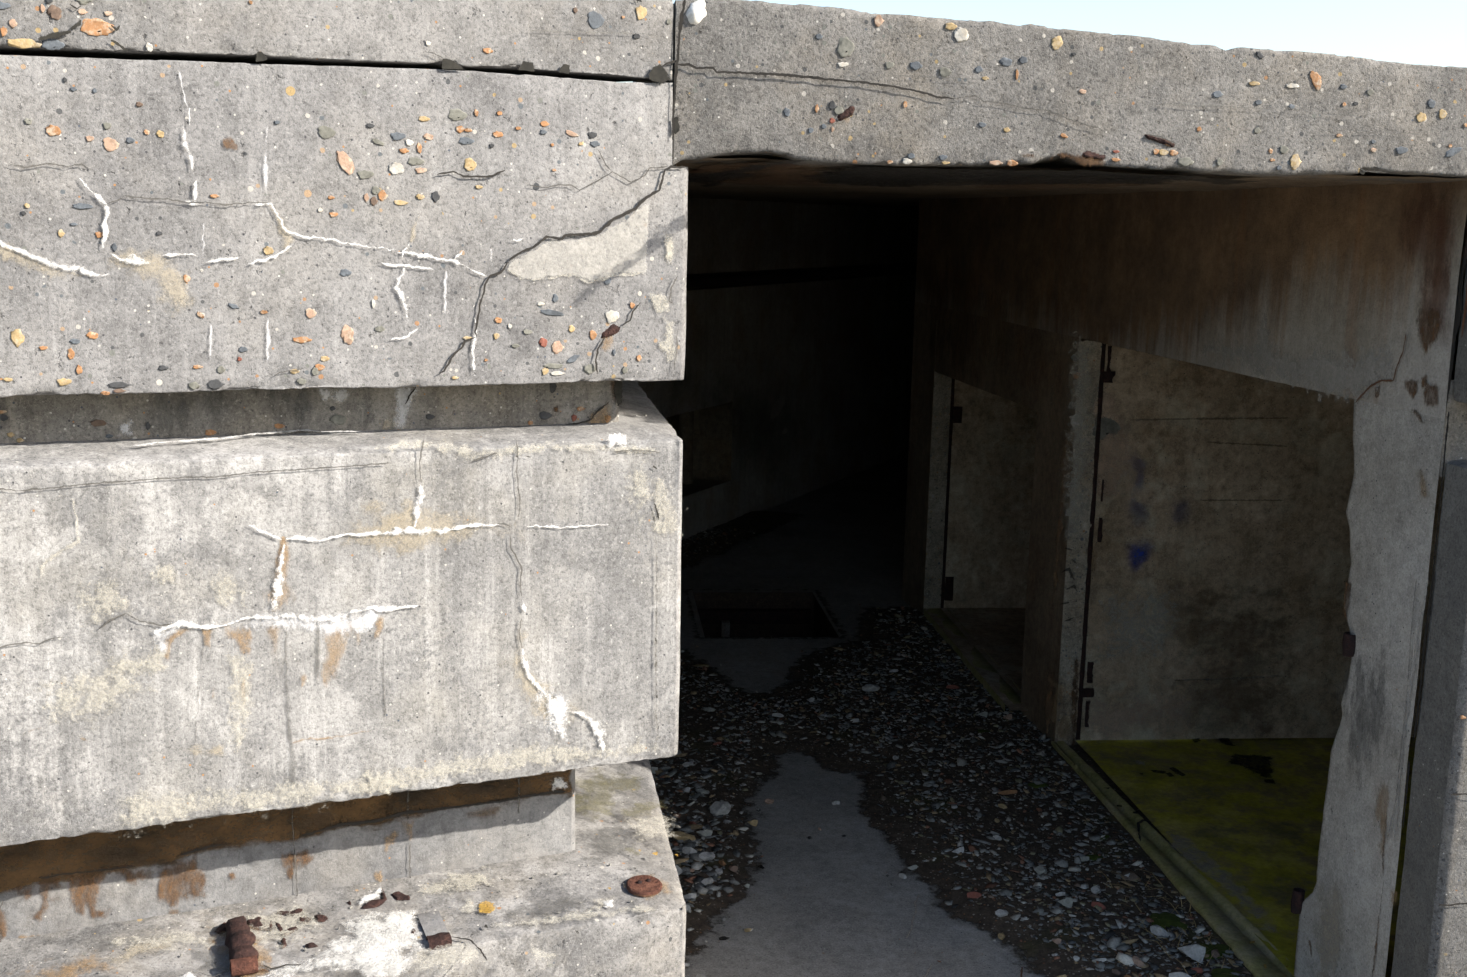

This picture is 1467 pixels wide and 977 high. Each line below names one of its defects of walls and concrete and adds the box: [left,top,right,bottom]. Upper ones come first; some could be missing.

crack [678,63,1100,129]
crack [11,162,91,170]
crack [107,195,269,206]
crack [405,150,686,404]
peeling [508,205,673,283]
crack [565,302,641,425]
spalling [601,324,620,338]
peeling [653,276,678,370]
water stain [43,486,499,722]
corrosion [0,860,205,942]
corrosion [214,808,328,977]
corrosion [347,872,410,909]